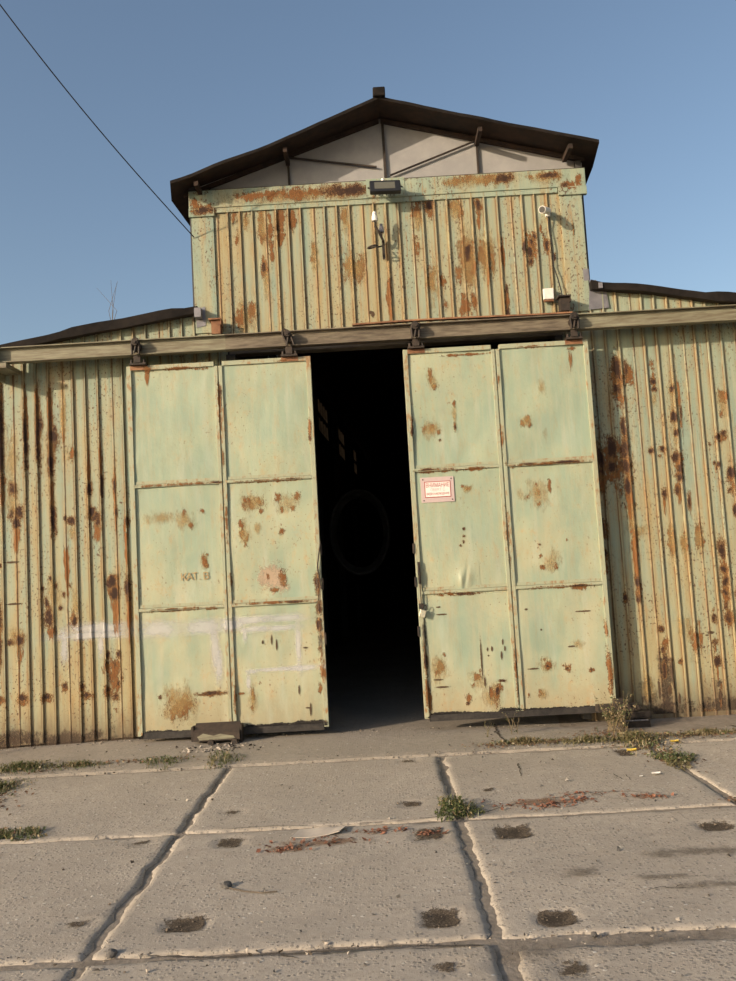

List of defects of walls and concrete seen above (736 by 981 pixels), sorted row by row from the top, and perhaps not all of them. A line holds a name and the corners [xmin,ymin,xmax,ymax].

rust [230,182,375,293]
rust [426,198,510,317]
rust [437,170,582,190]
rust [0,382,58,541]
rust [224,477,314,547]
rust [506,345,644,604]
rust [649,359,692,511]
rust [0,570,132,712]
rust [422,621,449,715]
rust [486,650,545,707]
rust [642,624,683,710]
rust [667,522,736,708]